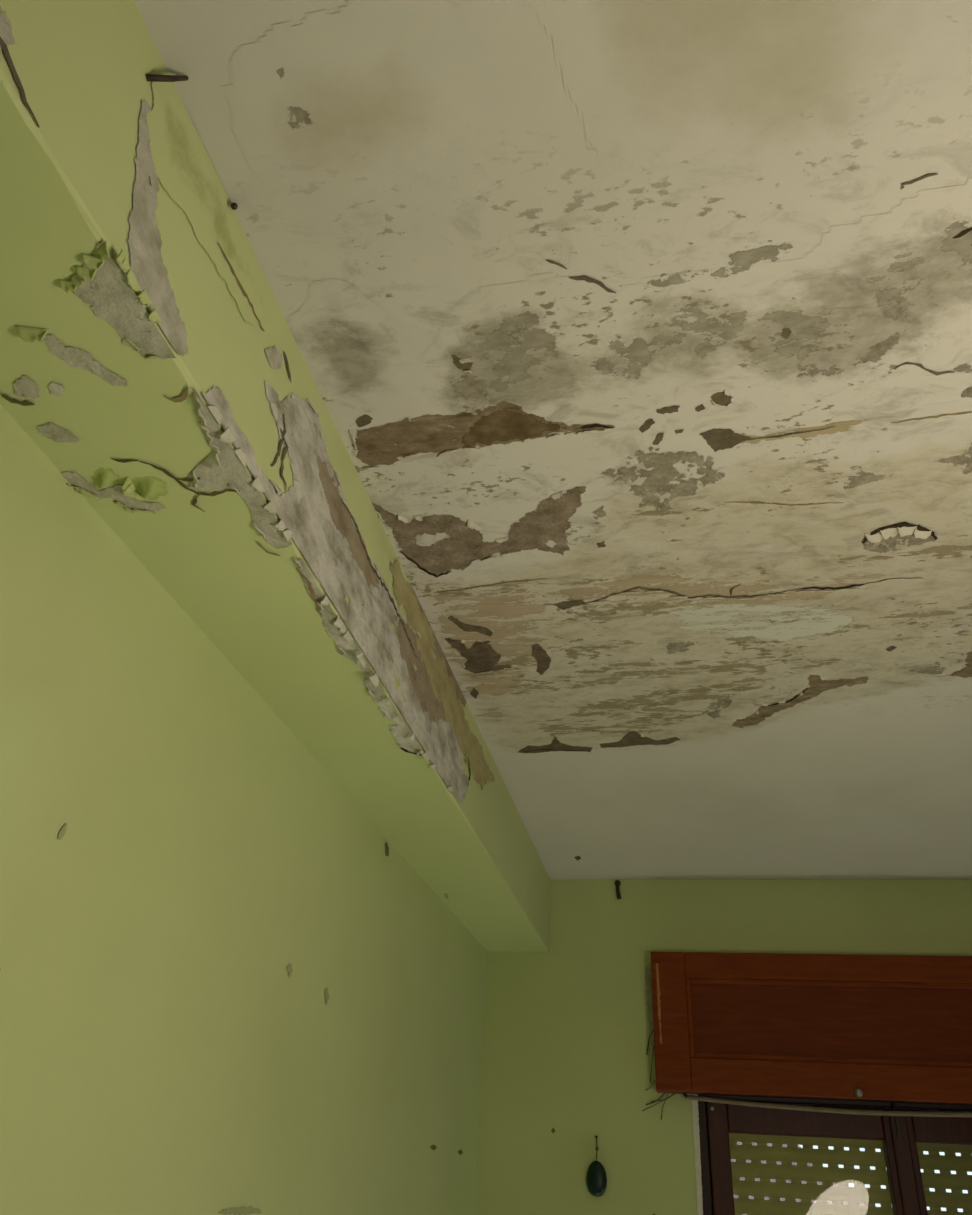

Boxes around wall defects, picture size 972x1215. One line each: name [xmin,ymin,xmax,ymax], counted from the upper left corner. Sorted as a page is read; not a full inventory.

crack [0,37,40,128]
peeling [57,99,188,360]
water stain [146,68,273,325]
water stain [288,177,972,428]
peeling [349,355,615,470]
peeling [602,405,751,514]
peeling [372,486,606,578]
peeling [188,381,514,803]
crack [574,578,924,606]
peeling [531,644,551,675]
peeling [519,731,681,753]
peeling [702,675,869,730]